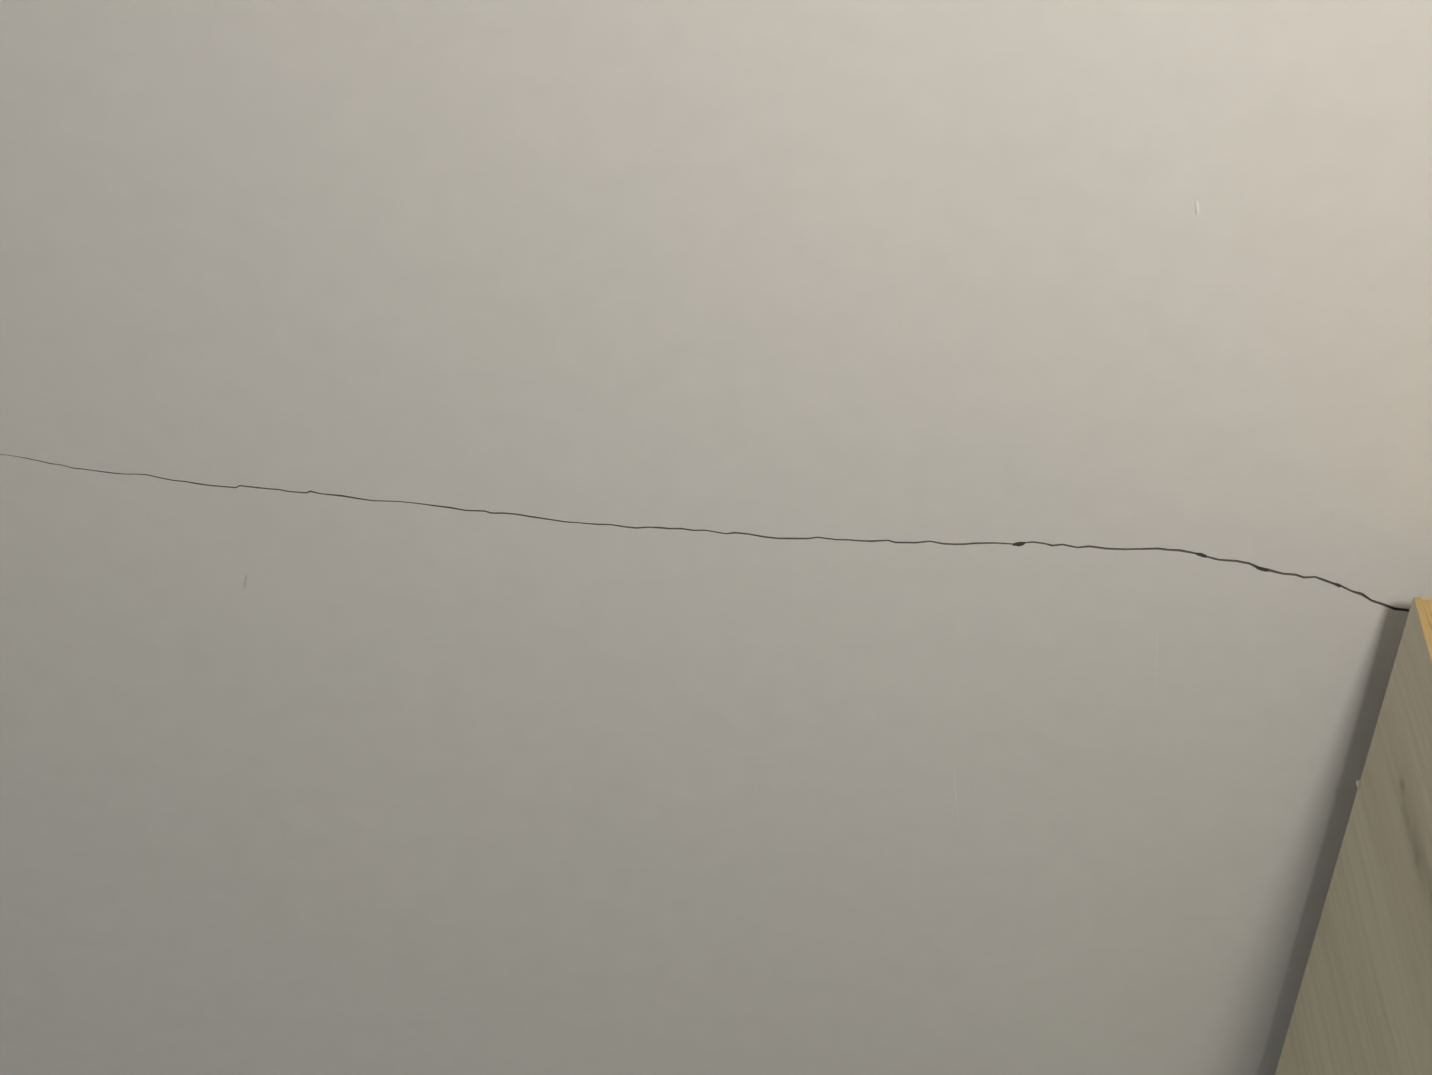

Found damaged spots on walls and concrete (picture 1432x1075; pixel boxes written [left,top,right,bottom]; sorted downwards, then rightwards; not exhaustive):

crack [0,454,1409,612]